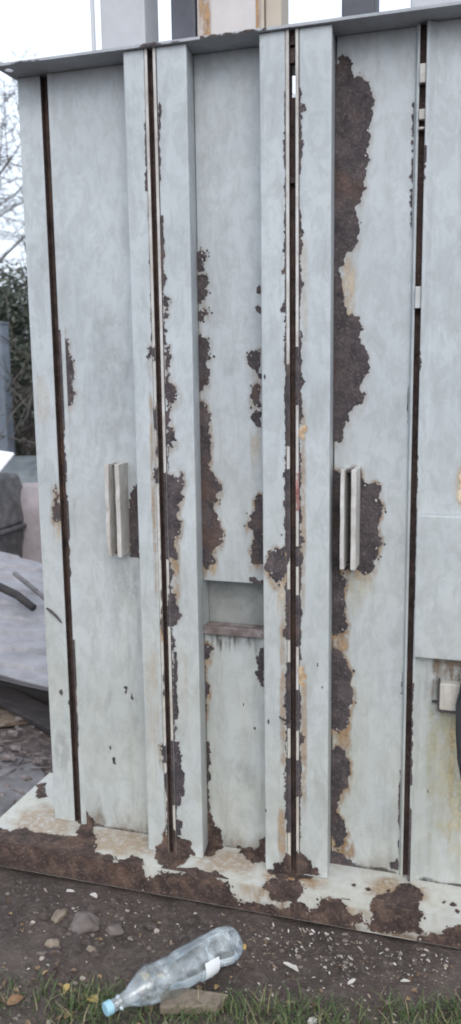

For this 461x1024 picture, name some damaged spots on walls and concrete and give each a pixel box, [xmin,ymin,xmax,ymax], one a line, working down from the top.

rust [299,87,307,174]
rust [333,54,375,443]
rust [0,185,461,949]